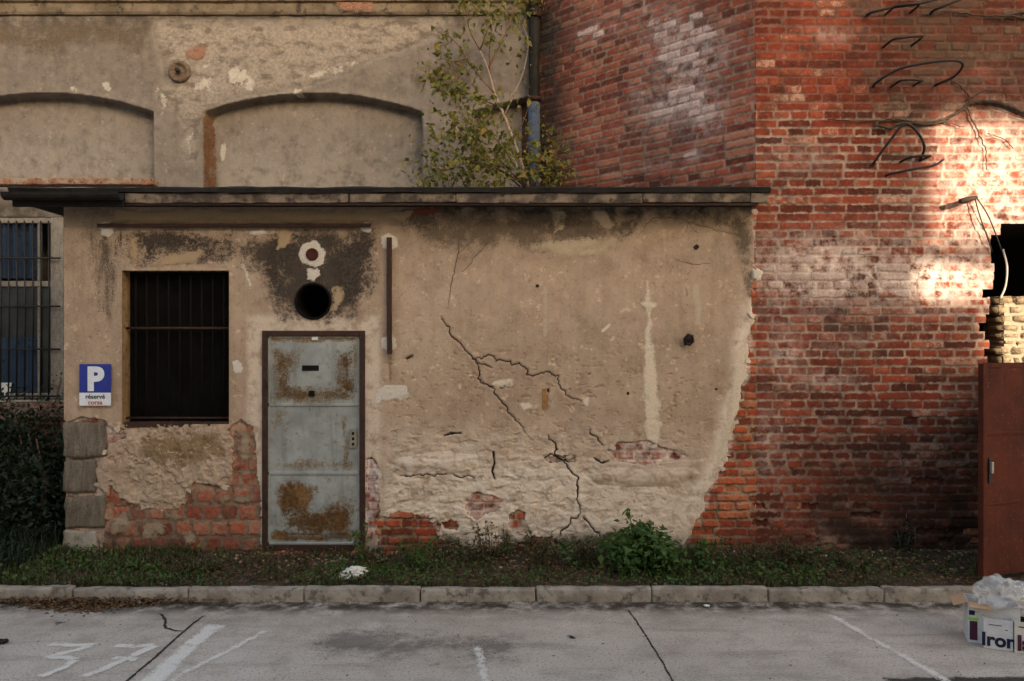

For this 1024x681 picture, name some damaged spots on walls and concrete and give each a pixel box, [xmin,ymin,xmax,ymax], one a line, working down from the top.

rust [202,115,217,187]
water stain [403,209,641,256]
water stain [652,208,753,296]
crack [447,216,569,427]
water stain [641,279,663,444]
spalling [683,209,758,551]
spalling [62,417,262,551]
spalling [365,458,567,552]
crack [544,437,600,535]
spalling [595,441,688,466]